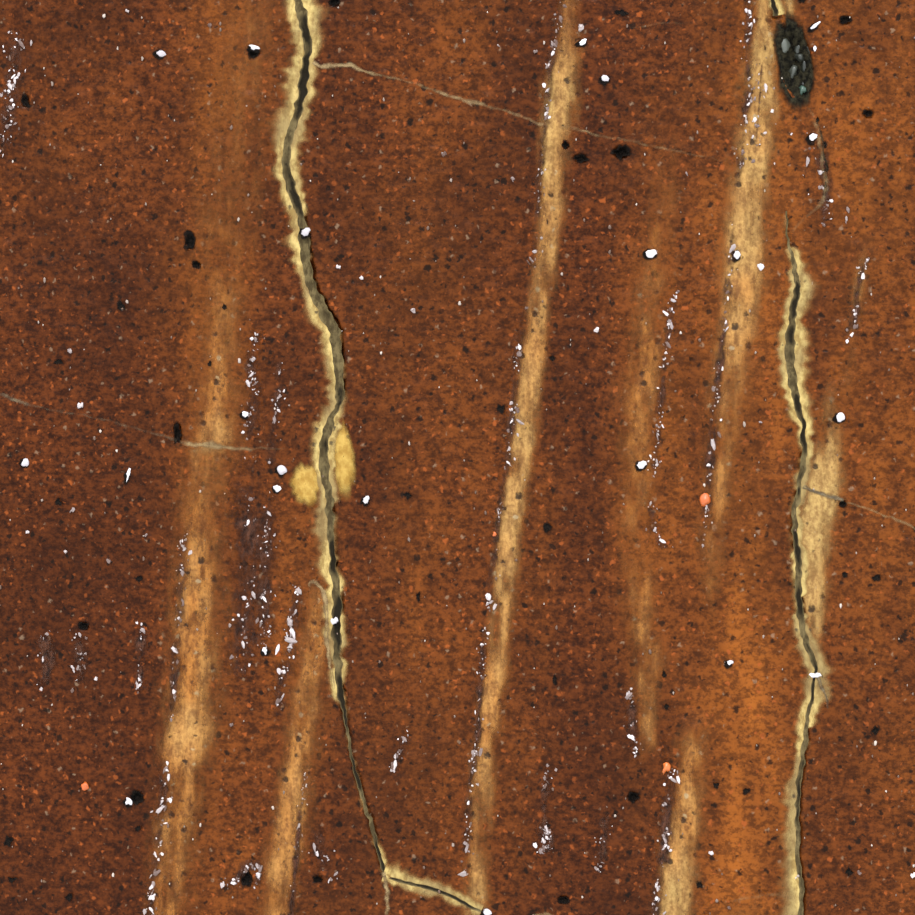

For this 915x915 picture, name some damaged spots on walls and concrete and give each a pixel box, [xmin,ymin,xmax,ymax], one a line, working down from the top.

crack [273,0,484,915]
water stain [467,0,580,909]
water stain [659,735,703,915]
water stain [713,0,779,525]
spalling [773,14,814,109]
crack [778,211,843,915]
crack [820,130,828,166]